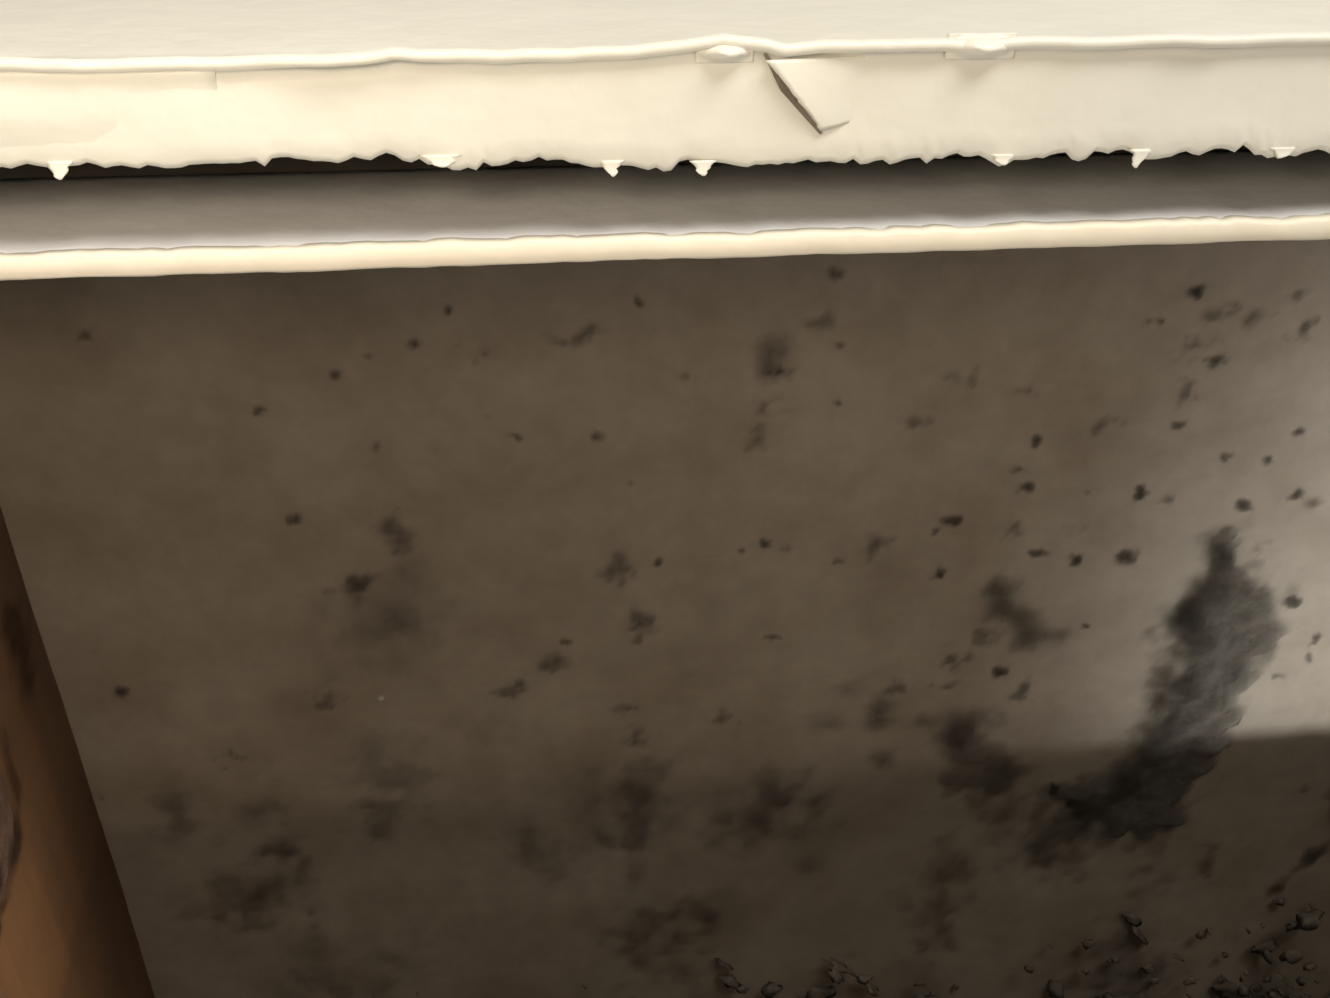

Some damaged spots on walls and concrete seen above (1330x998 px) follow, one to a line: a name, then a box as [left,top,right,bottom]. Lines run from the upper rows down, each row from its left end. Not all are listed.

spalling [944,33,1018,60]
peeling [763,53,869,134]
peeling [47,161,73,180]
peeling [418,155,460,168]
peeling [601,160,624,177]
peeling [689,160,717,176]
peeling [992,154,1014,165]
peeling [1128,149,1151,168]
peeling [1269,147,1295,159]
leakage [1066,535,1282,840]